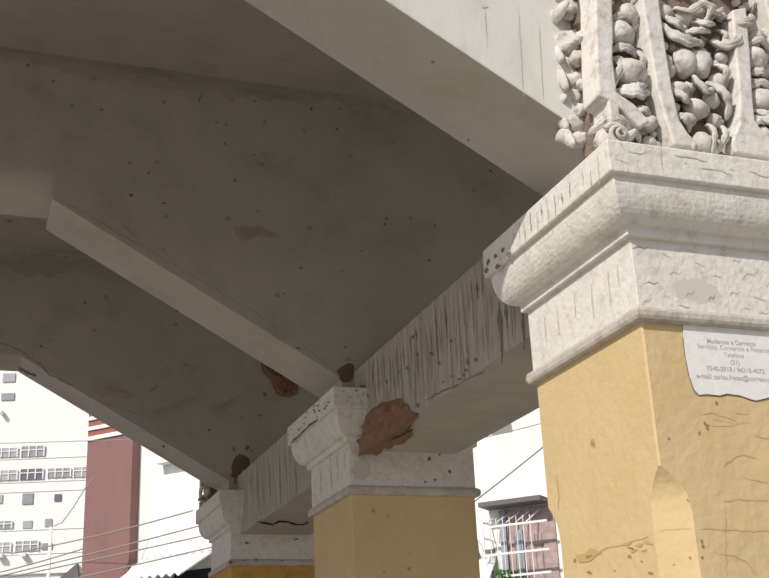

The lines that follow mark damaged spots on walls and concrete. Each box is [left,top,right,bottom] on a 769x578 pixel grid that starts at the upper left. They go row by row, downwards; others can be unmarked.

spalling [261,362,299,398]
spalling [356,398,419,456]
crack [261,519,306,527]
crack [598,478,769,578]